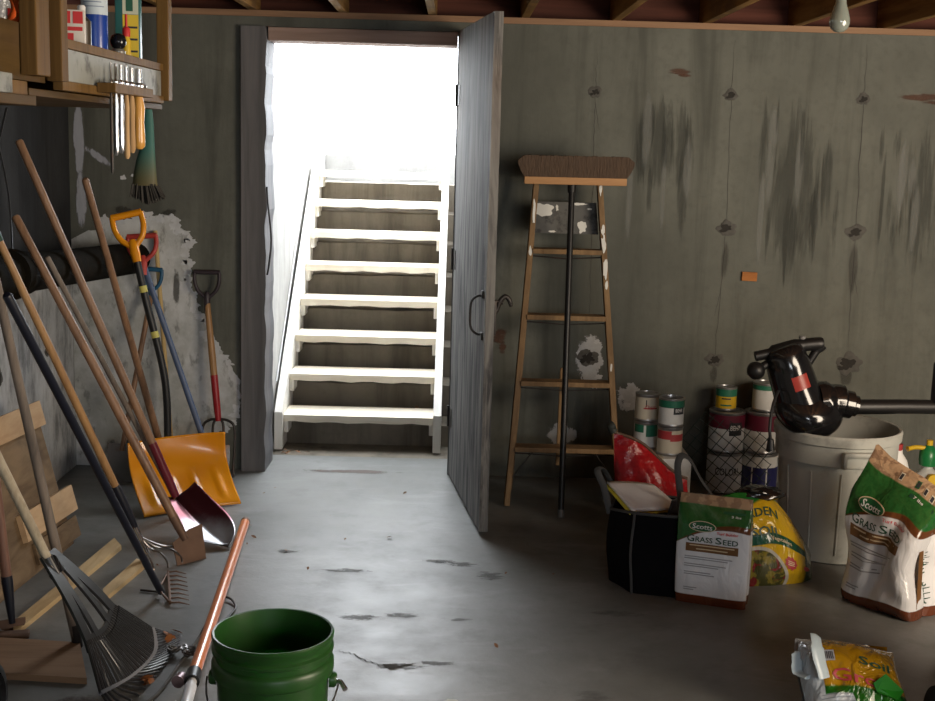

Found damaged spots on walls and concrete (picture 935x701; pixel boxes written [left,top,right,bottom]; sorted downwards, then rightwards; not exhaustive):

peeling [71,211,241,465]